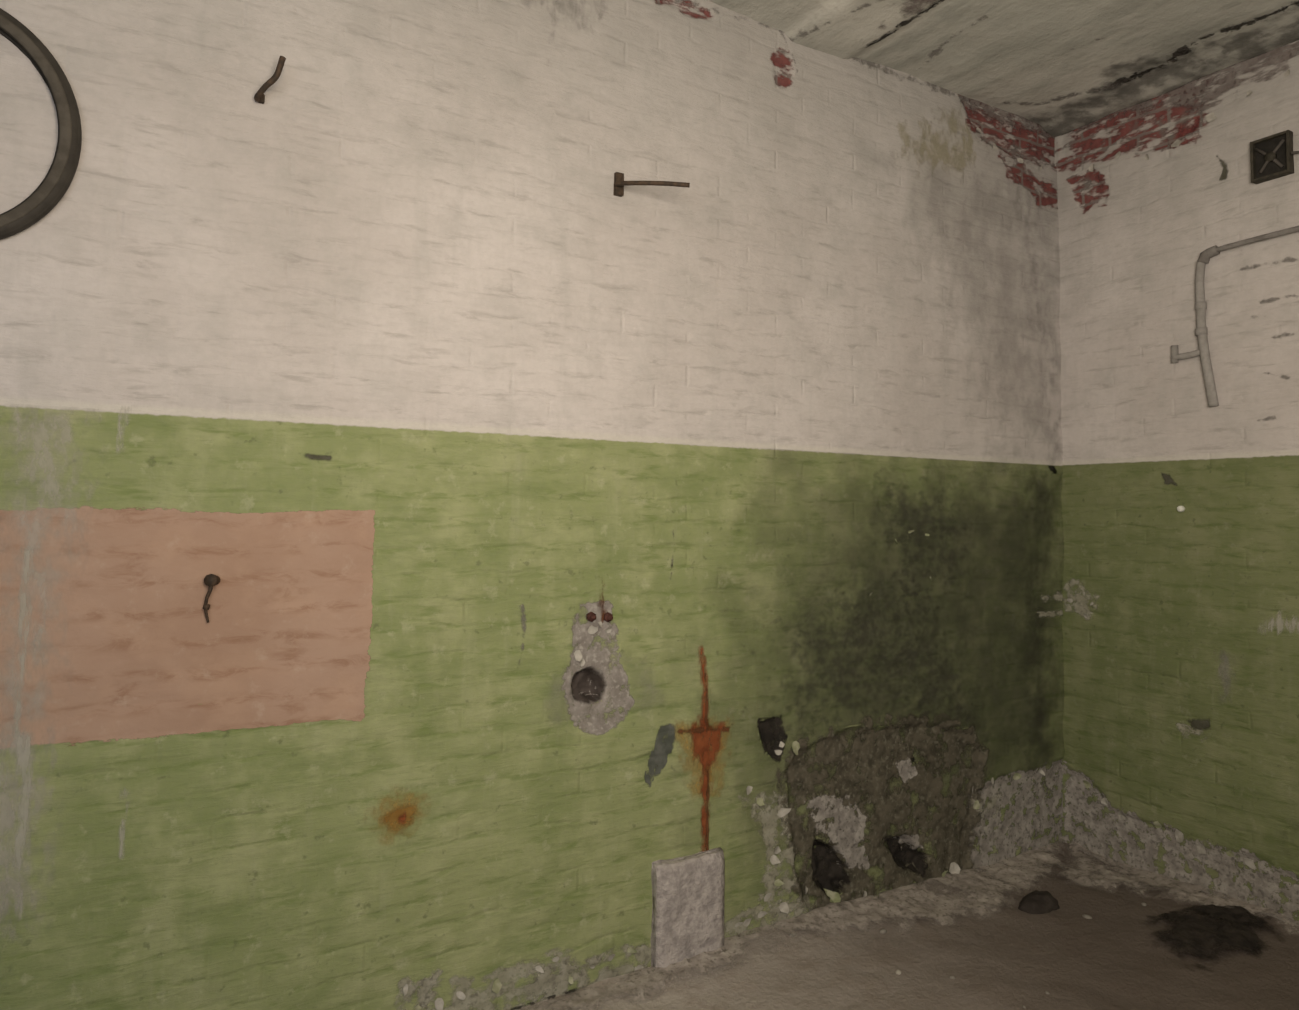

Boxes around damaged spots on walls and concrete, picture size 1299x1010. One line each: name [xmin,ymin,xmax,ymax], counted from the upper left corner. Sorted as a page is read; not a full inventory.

flaking render [655,0,712,19]
flaking render [770,48,792,88]
flaking render [960,41,1299,214]
peeling [574,650,585,667]
corrosion [677,648,729,851]
corrosion [380,795,418,832]
spalling [724,713,1299,937]